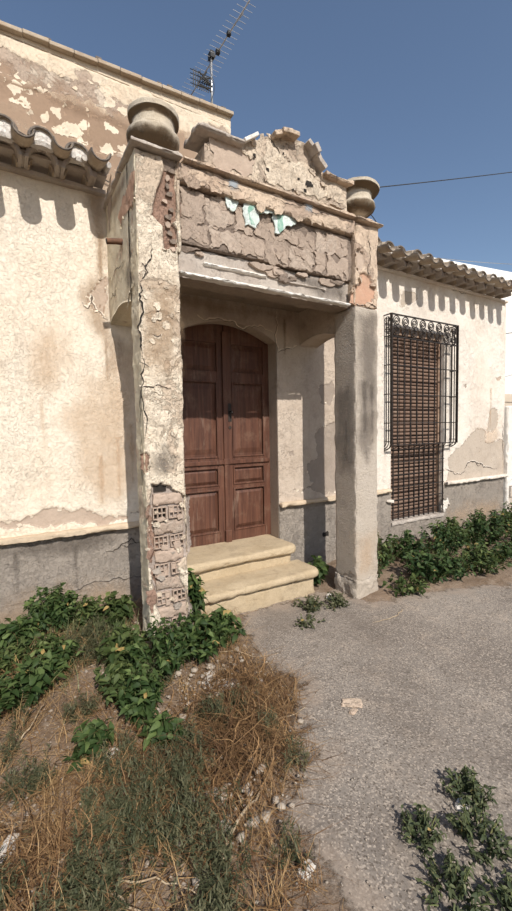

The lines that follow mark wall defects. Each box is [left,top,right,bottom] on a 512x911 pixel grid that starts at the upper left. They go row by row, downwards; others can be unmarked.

peeling [0,41,128,158]
flaking render [208,122,340,203]
flaking render [106,170,135,230]
flaking render [152,151,377,308]
flaking render [139,288,180,344]
flaking render [170,427,183,439]
flaking render [446,408,504,481]
crack [106,534,140,552]